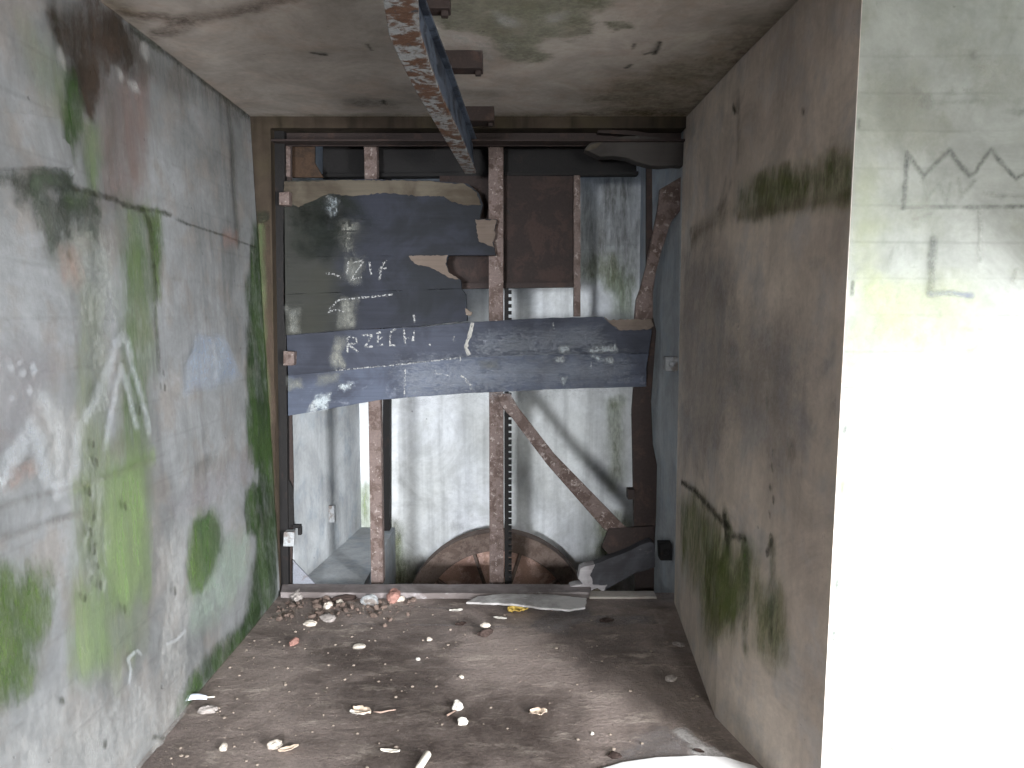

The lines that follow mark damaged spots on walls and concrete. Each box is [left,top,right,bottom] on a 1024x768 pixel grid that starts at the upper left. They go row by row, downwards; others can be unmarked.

crack [74,106,255,317]
damp [125,212,148,448]
damp [256,212,276,468]
crack [681,481,746,543]